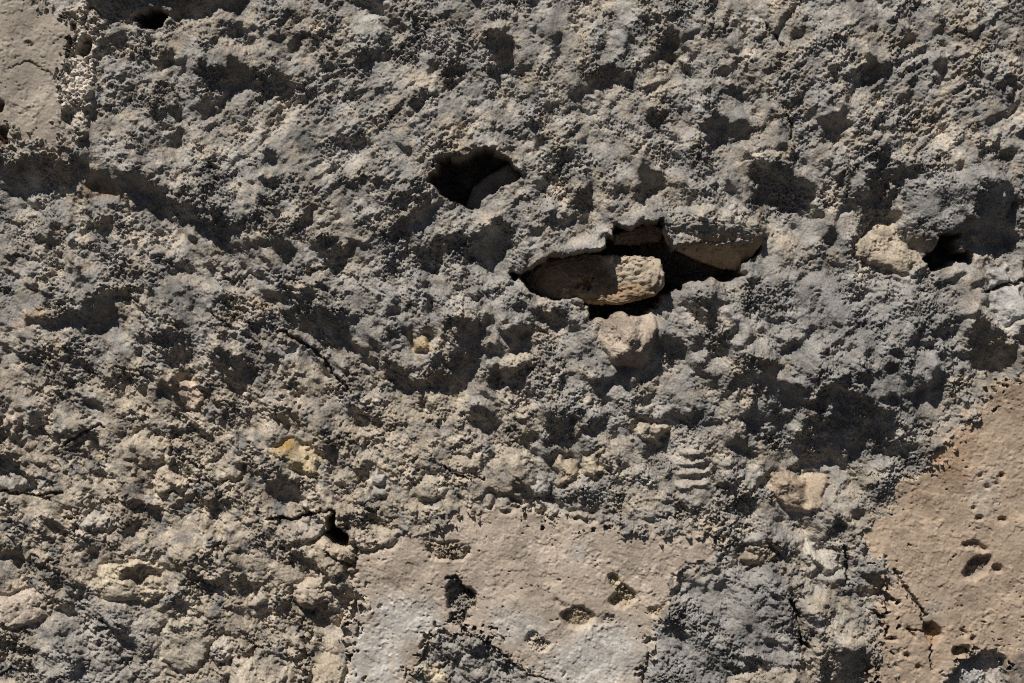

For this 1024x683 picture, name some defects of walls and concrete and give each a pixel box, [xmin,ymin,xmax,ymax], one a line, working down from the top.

crack [277,330,350,391]
crack [265,508,332,522]